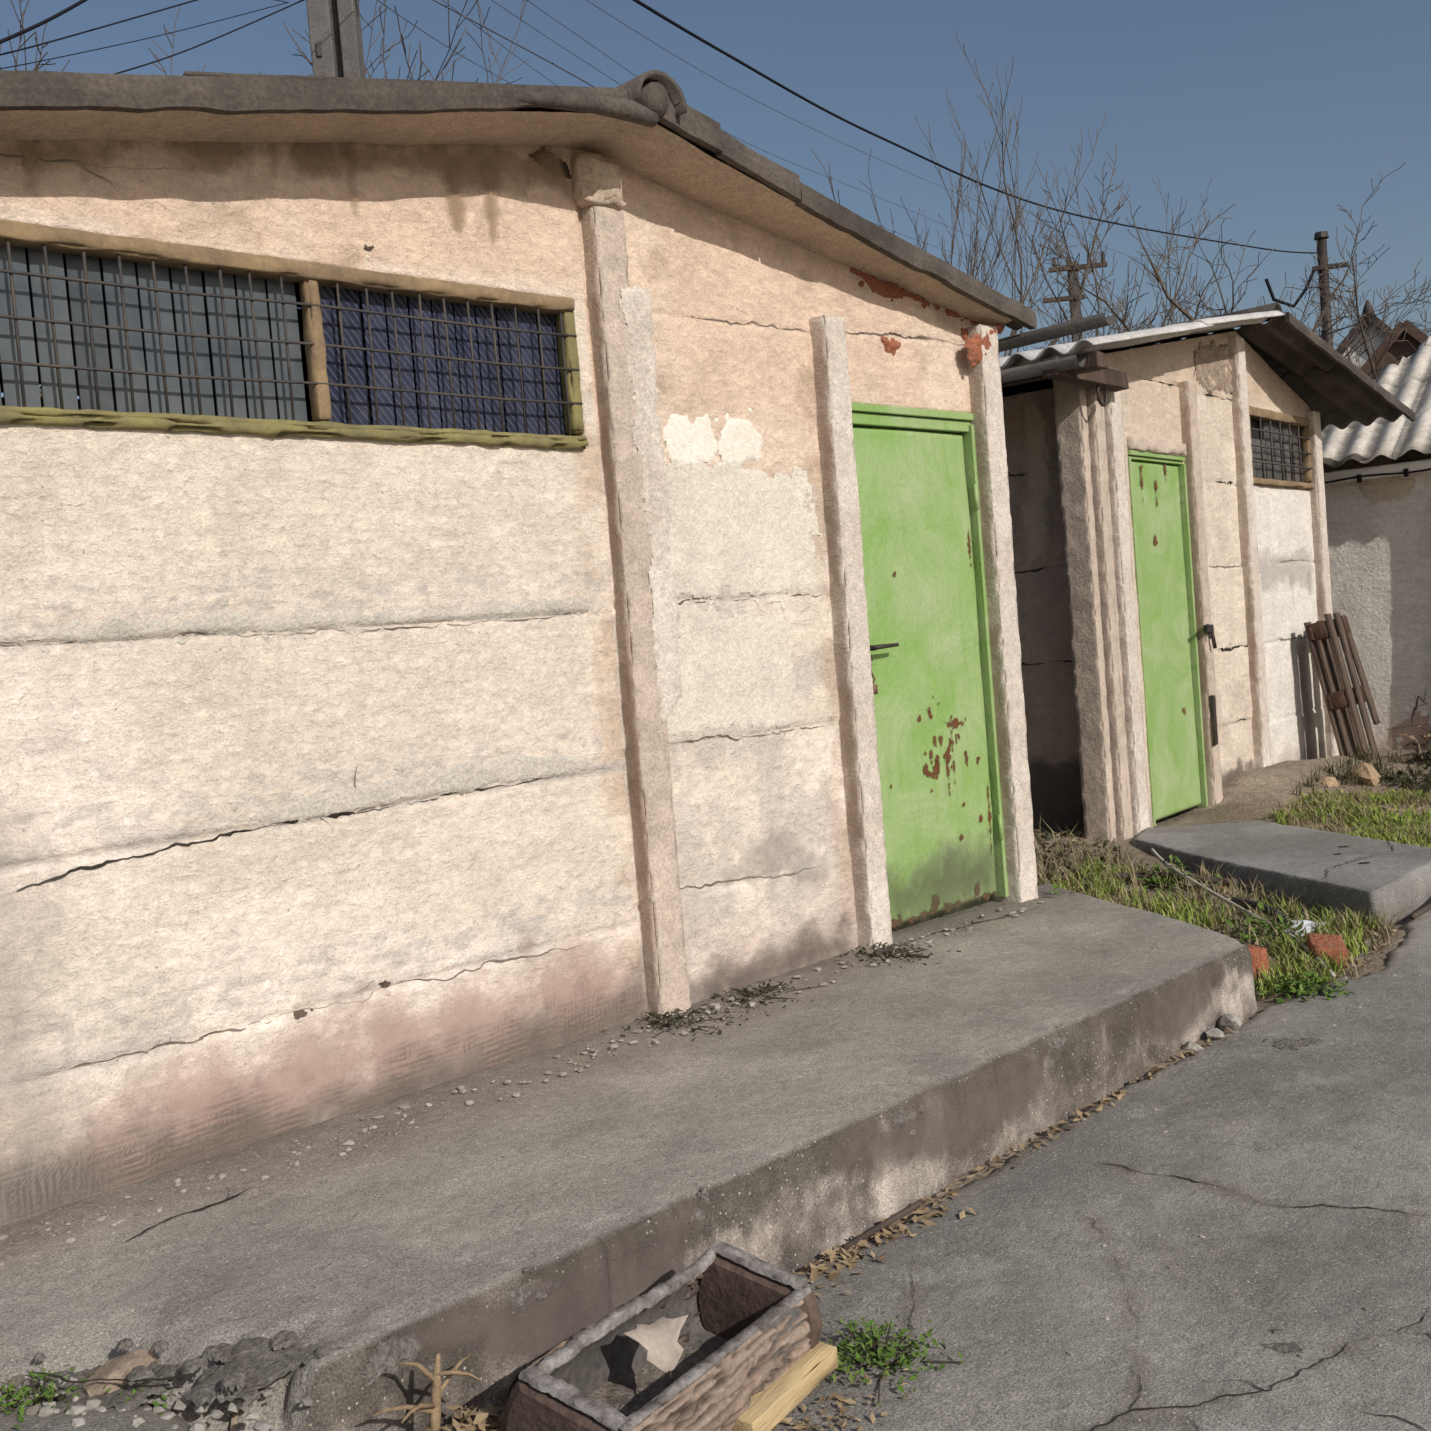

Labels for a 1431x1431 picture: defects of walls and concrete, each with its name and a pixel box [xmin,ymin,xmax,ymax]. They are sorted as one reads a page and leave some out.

damp [187,141,249,170]
damp [293,142,570,231]
spalling [850,268,1005,368]
flaking render [619,285,823,737]
crack [0,639,74,647]
crack [181,613,581,637]
corrosion [917,697,980,807]
crack [17,764,553,892]
corrosion [979,786,992,852]
corrosion [891,882,996,928]
crack [31,945,584,1079]
crack [126,1176,273,1242]